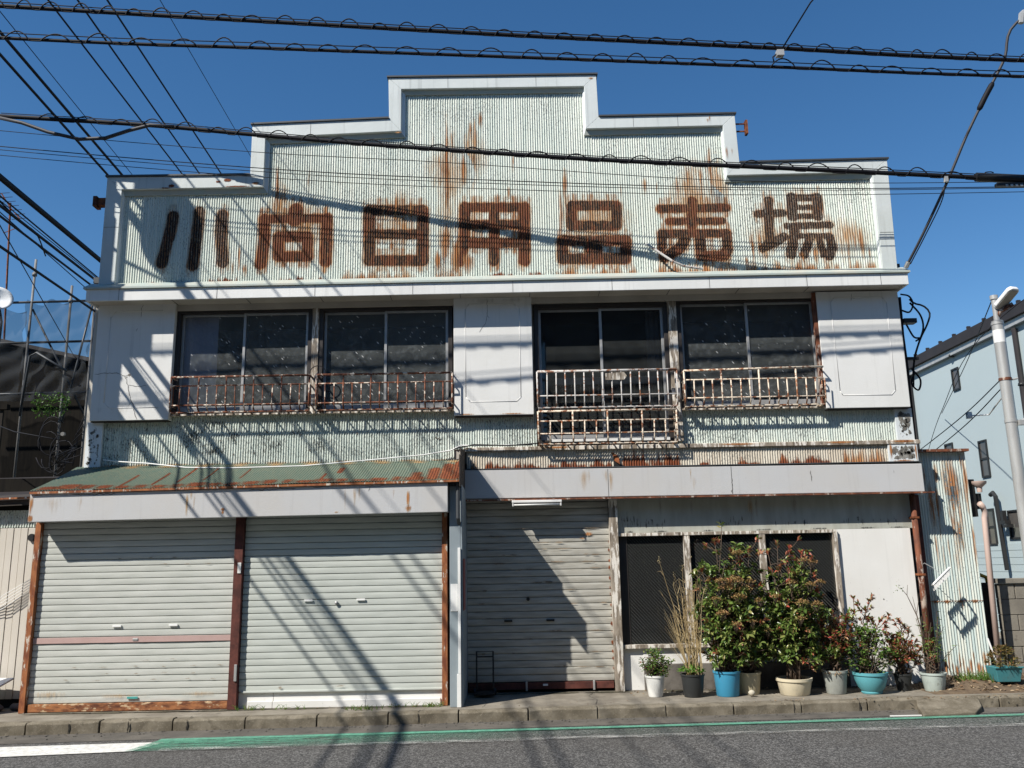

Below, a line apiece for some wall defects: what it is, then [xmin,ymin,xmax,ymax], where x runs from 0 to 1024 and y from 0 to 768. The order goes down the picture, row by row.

corrosion [342,114,545,279]
corrosion [556,174,636,274]
corrosion [656,150,877,272]
corrosion [28,446,680,521]
corrosion [779,454,830,465]
corrosion [828,440,977,566]
corrosion [937,653,990,675]